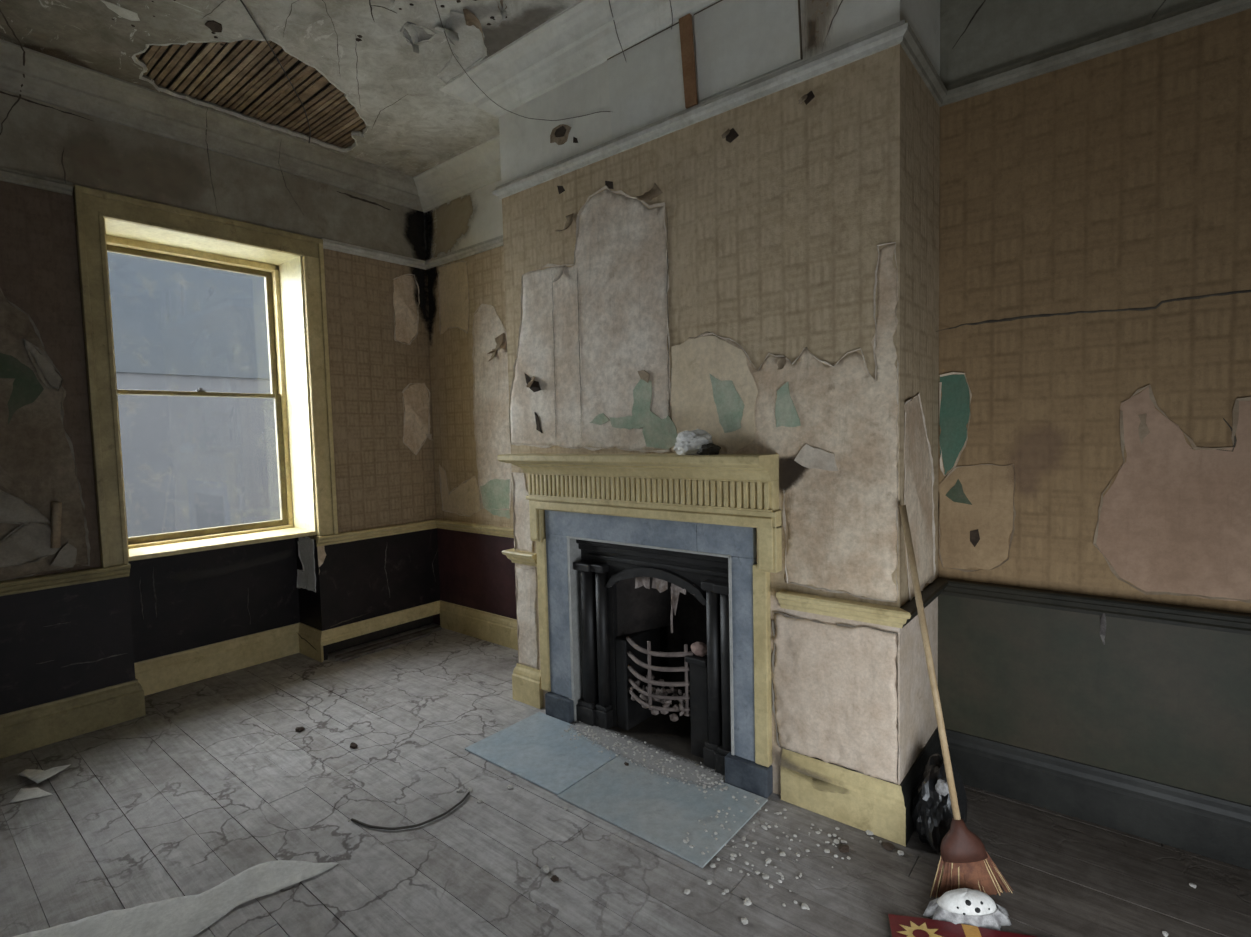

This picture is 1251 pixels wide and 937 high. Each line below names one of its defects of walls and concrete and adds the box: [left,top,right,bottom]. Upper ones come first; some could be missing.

crack [0,9,92,135]
flaking render [132,20,371,152]
crack [283,0,406,129]
peeling [389,0,507,86]
crack [952,0,986,49]
peeling [393,275,418,344]
peeling [403,383,430,454]
peeling [438,190,675,552]
peeling [685,243,1015,602]
peeling [1095,386,1251,601]
peeling [515,566,539,668]